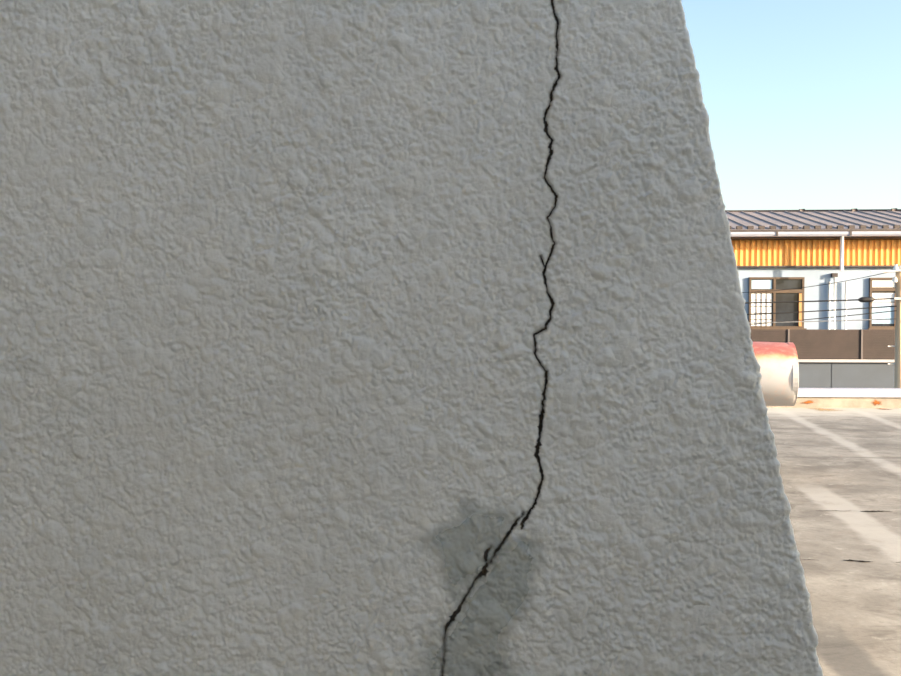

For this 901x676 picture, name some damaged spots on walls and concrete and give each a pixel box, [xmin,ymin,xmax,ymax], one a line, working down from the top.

crack [441,0,561,676]